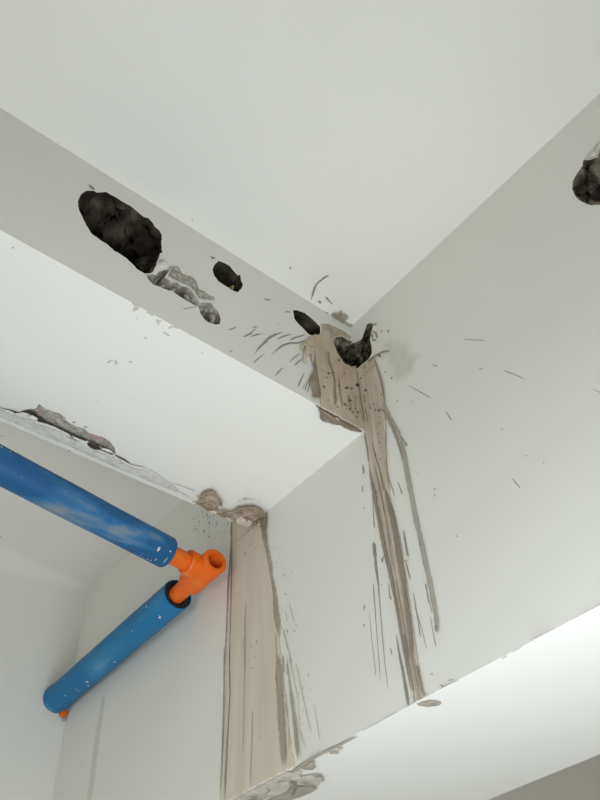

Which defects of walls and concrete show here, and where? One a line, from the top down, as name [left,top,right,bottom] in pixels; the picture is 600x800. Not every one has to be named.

spalling [146,259,221,325]
spalling [334,323,389,369]
spalling [20,404,116,455]
water stain [362,435,436,704]
water stain [220,513,320,800]